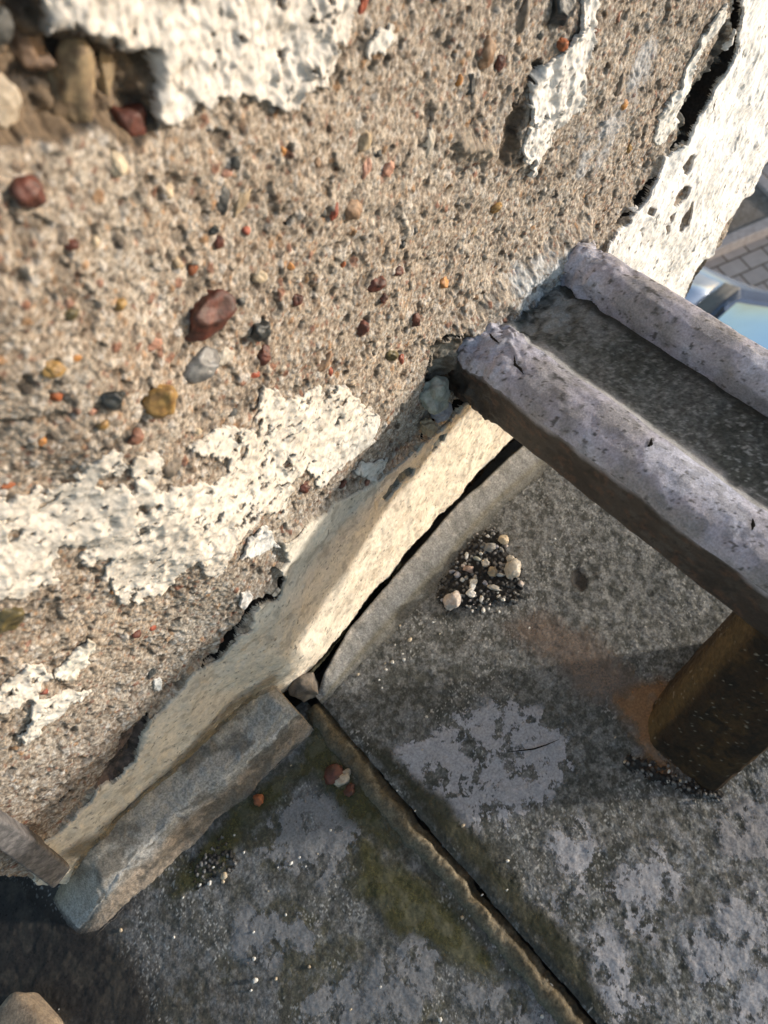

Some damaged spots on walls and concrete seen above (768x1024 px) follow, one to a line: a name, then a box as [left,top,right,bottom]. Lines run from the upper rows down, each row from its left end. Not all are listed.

peeling [0,0,359,147]
peeling [365,23,397,61]
peeling [496,0,601,178]
crack [670,0,741,151]
crack [618,176,657,219]
crack [201,576,284,668]
peeling [0,384,513,886]